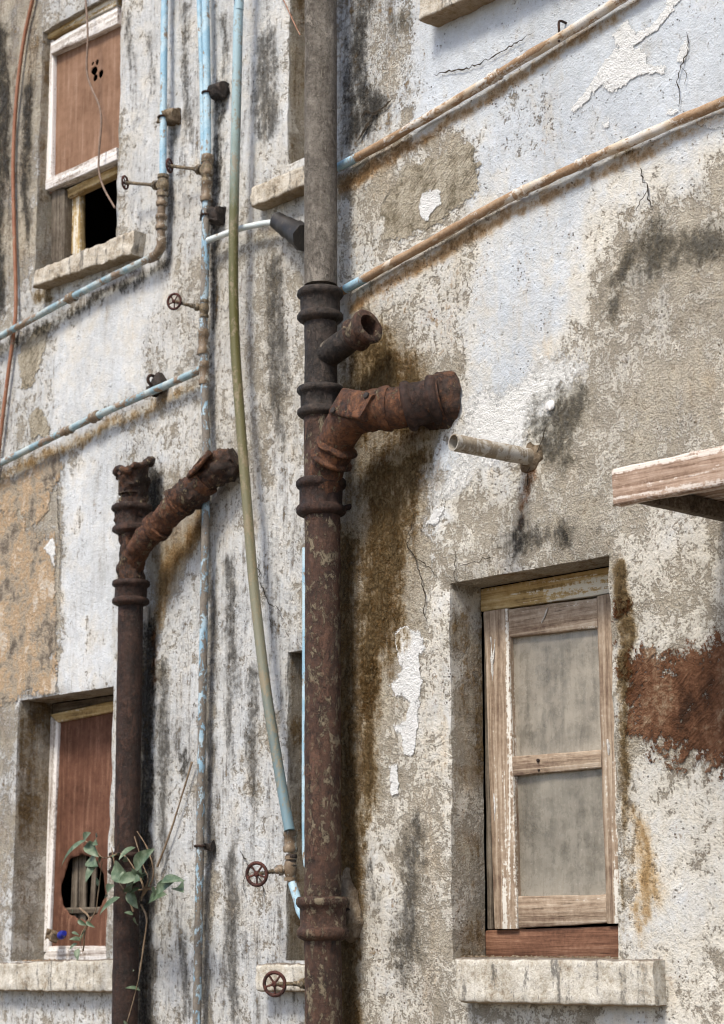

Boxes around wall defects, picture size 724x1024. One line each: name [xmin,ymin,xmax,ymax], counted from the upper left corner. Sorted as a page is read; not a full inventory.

water stain [344,0,384,144]
crack [436,31,535,76]
peeling [570,0,689,113]
crack [676,32,689,104]
spalling [377,140,482,241]
crack [636,168,653,210]
water stain [340,453,431,888]
peeling [388,626,426,756]
water stain [614,559,635,815]
peeling [389,764,399,796]